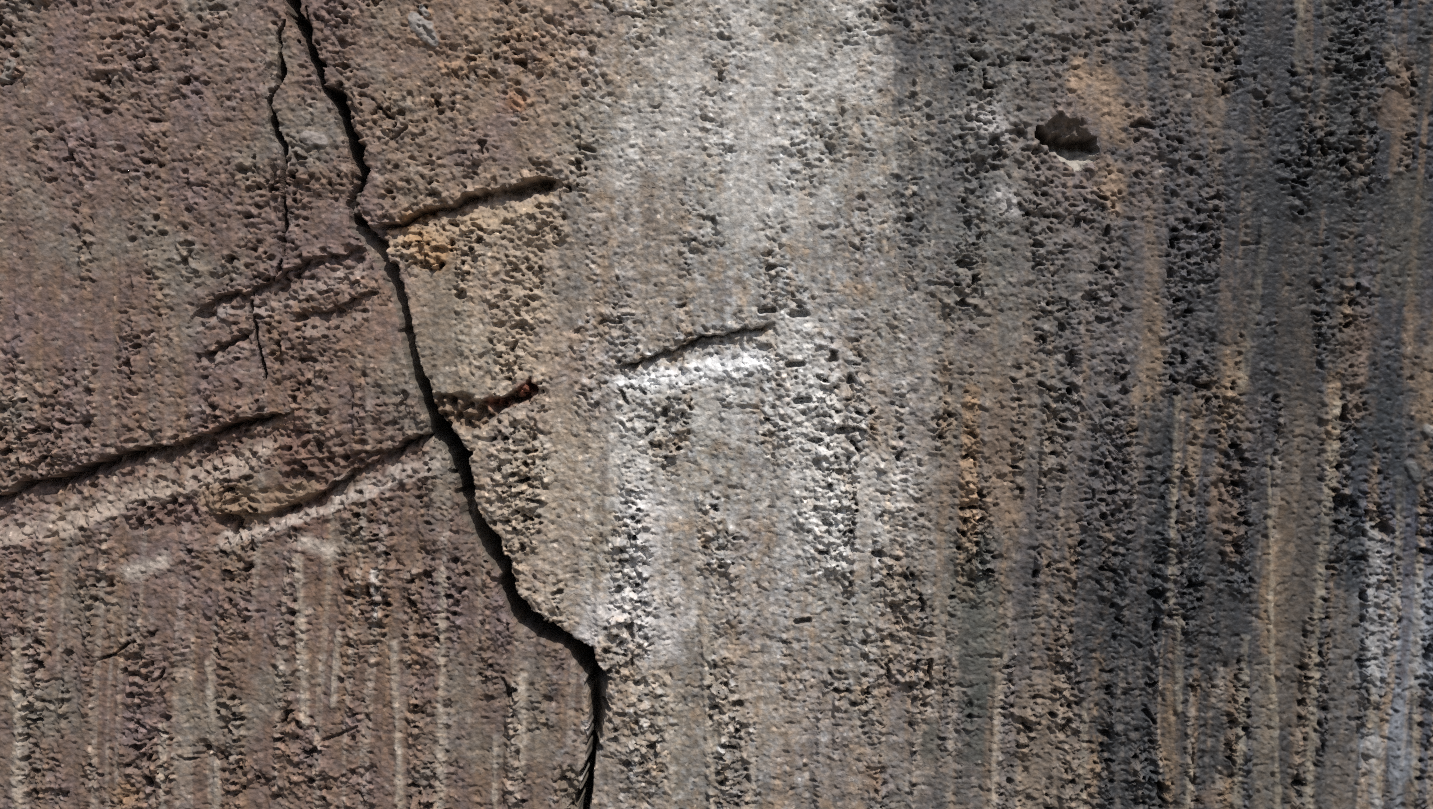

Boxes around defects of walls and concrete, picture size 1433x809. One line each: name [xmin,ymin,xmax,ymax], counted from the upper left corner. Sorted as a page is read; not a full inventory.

crack [83,640,132,681]
crack [128,717,230,764]
crack [247,0,614,809]
water stain [1045,0,1433,809]